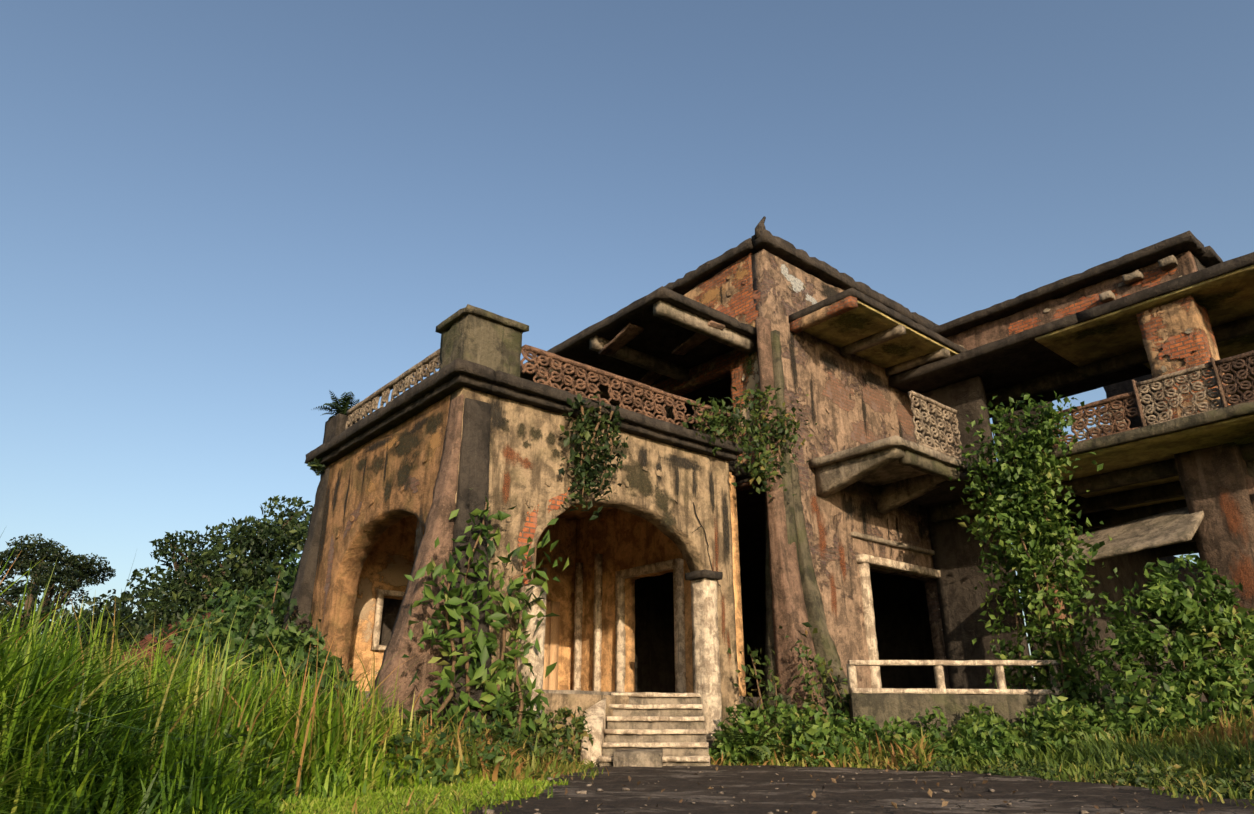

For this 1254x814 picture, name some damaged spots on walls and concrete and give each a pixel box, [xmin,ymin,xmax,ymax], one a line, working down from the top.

spalling [700,268,761,324]
spalling [1005,268,1181,338]
spalling [1158,328,1201,395]
leakage [489,398,569,458]
leakage [316,412,443,570]
leakage [638,446,729,577]